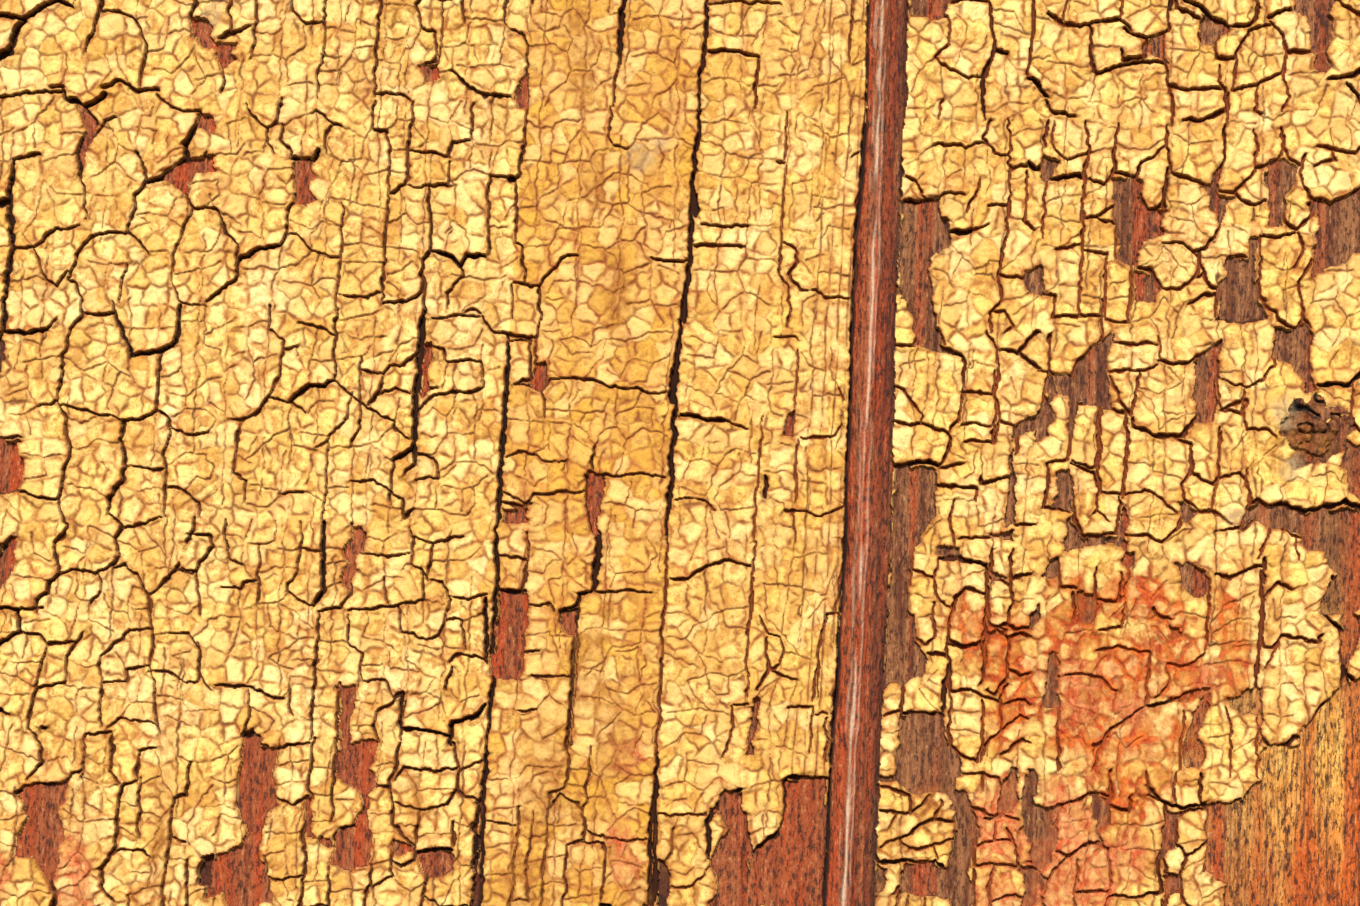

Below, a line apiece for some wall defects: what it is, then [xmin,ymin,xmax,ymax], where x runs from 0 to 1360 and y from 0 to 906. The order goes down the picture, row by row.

crack [0,0,867,906]
peeling [874,0,1360,906]
crack [875,0,1360,906]
peeling [465,567,602,700]
peeling [0,756,92,905]
peeling [148,662,504,906]
peeling [625,673,832,906]